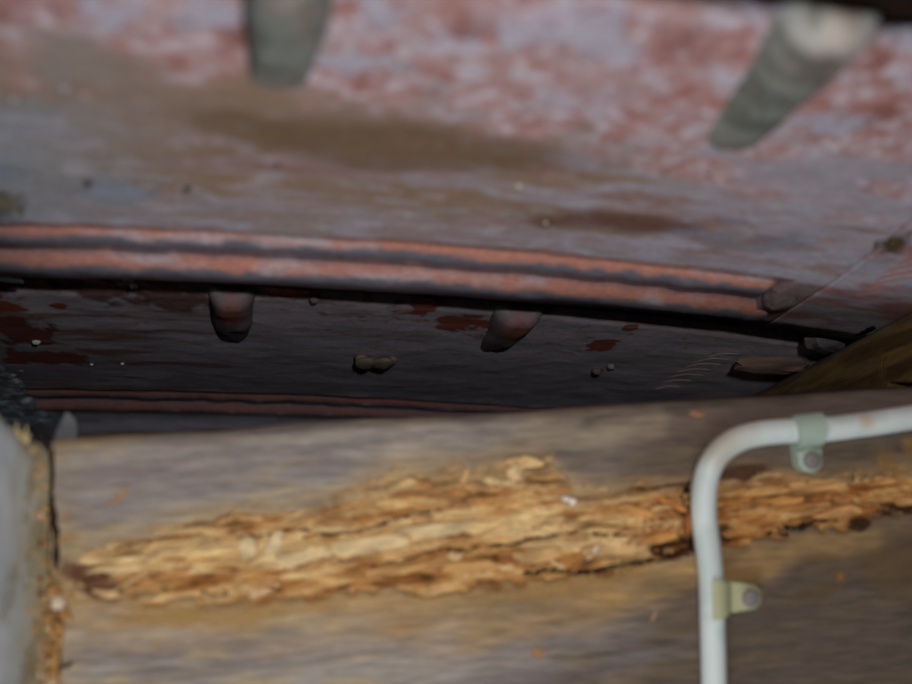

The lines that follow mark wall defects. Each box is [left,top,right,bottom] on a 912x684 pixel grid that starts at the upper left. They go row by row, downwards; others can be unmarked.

peeling [87,533,220,599]
peeling [247,581,279,599]
peeling [237,455,576,569]
peeling [366,545,566,576]
peeling [557,497,692,561]
peeling [741,484,904,520]